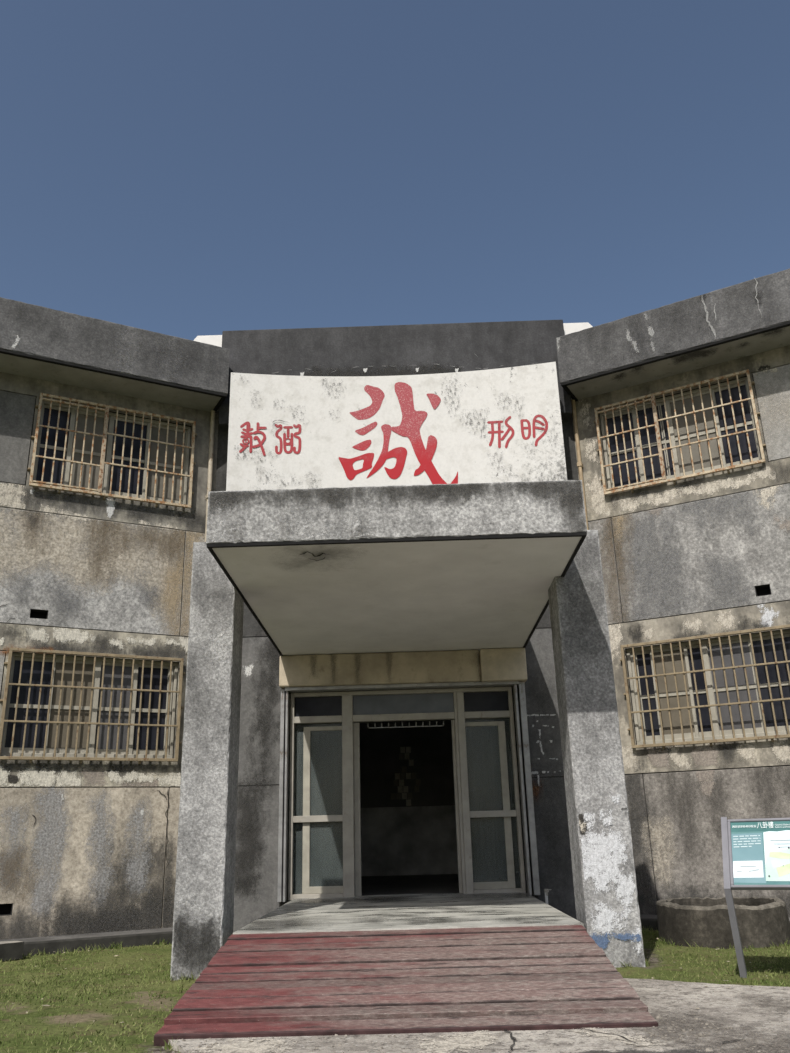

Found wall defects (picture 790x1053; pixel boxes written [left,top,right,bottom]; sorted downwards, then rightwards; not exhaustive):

crack [702,298,716,339]
leakage [35,639,187,667]
leakage [3,760,71,772]
leakage [89,761,170,774]
leakage [0,788,220,979]
crack [504,1029,520,1053]